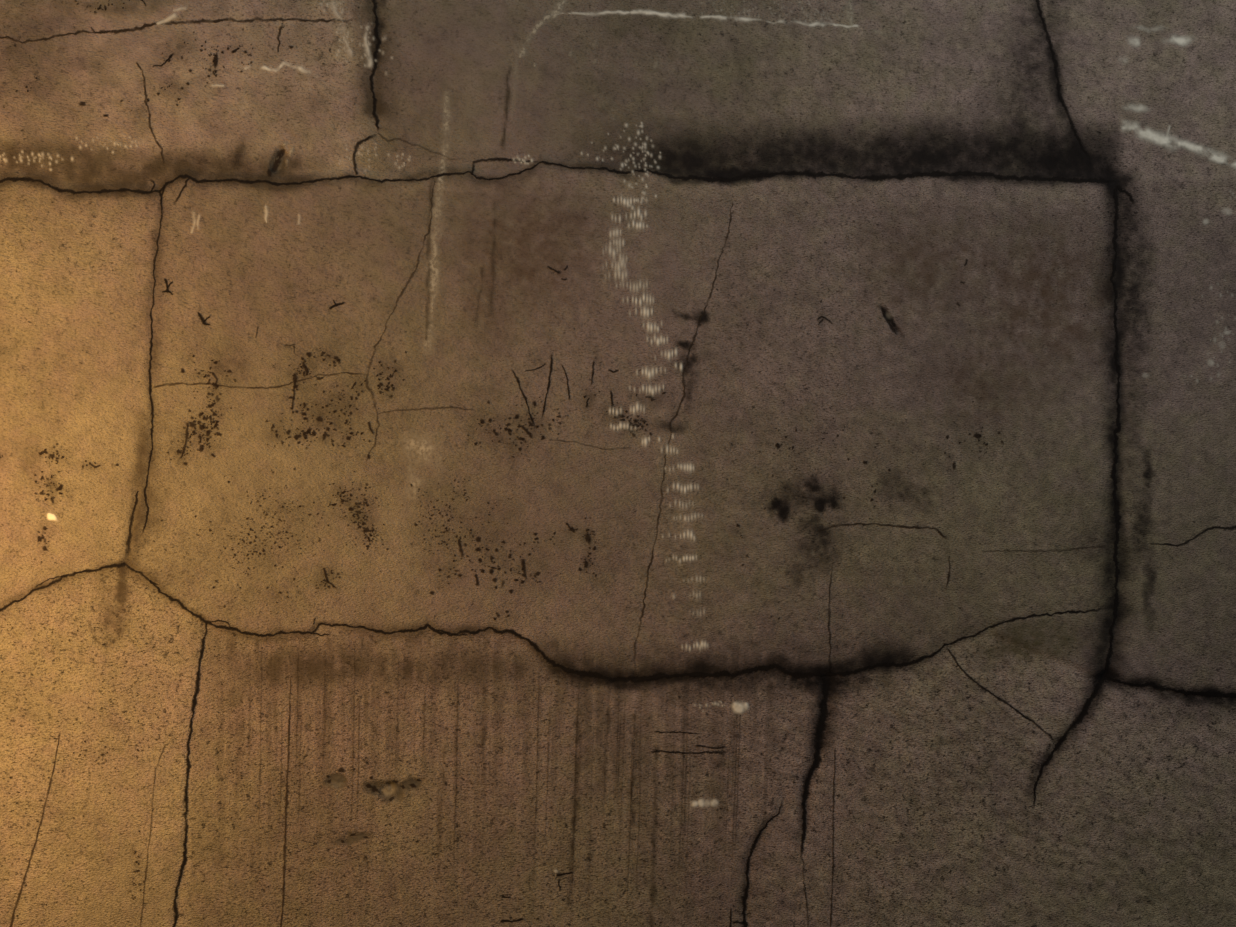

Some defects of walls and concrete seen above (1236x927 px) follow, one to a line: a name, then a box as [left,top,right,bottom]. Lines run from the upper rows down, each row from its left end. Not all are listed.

leakage [1122,106,1236,167]
crack [0,0,1108,551]
leakage [609,198,696,373]
leakage [606,369,696,539]
crack [640,204,733,621]
leakage [765,498,789,520]
leakage [802,479,845,550]
crack [819,523,950,584]
crack [1033,185,1236,804]
crack [0,563,1098,927]
leakage [692,799,718,807]
leakage [715,702,748,713]